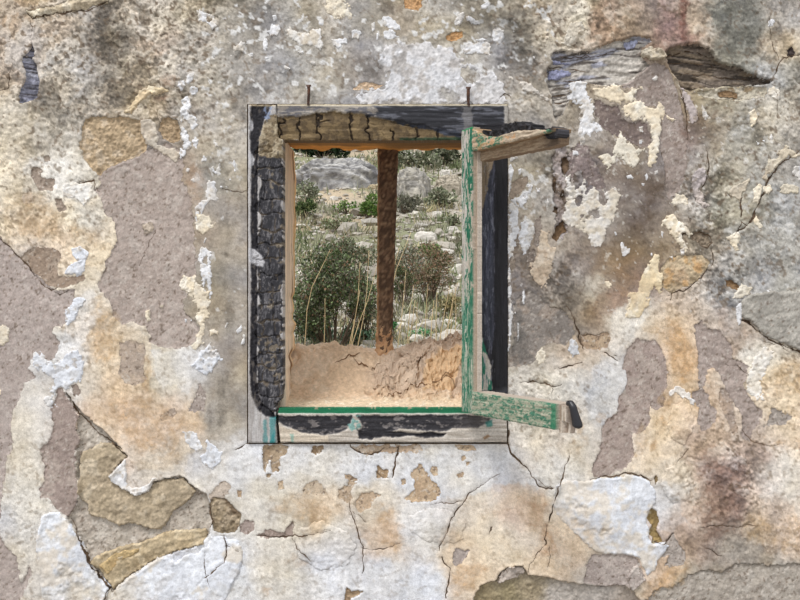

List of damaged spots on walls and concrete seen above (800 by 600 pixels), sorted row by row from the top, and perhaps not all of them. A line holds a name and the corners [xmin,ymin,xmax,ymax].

flaking render [19,45,40,103]
peeling [21,72,236,413]
peeling [353,12,780,367]
crack [728,151,799,236]
crack [71,518,111,600]
crack [66,392,128,456]
flaking render [0,237,295,600]
crack [350,444,399,478]
peeling [401,464,441,502]
crack [432,474,499,598]
crack [507,430,570,572]
peeling [591,320,792,477]